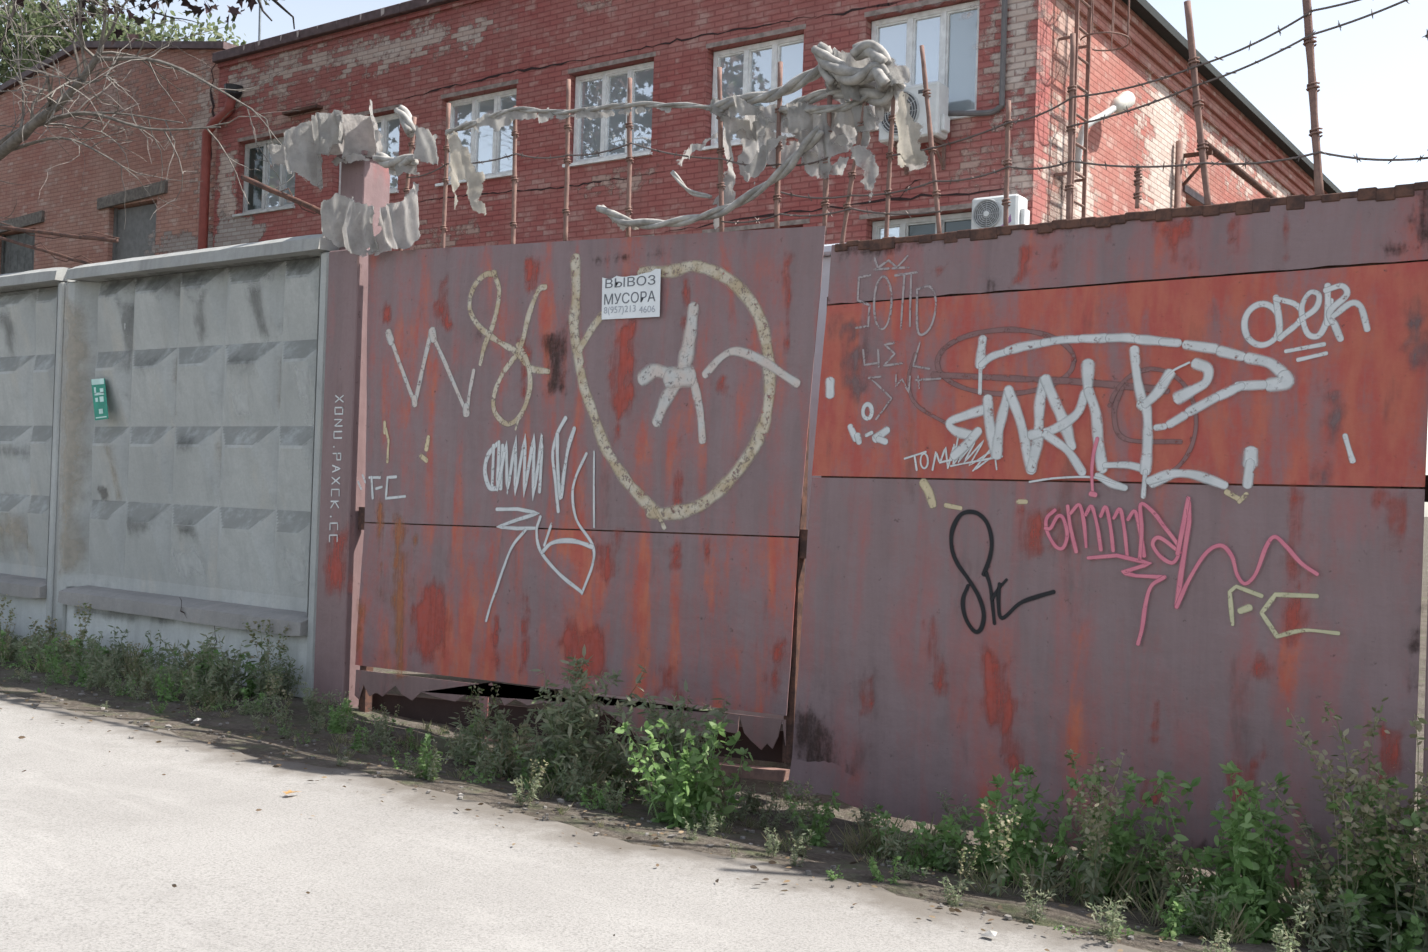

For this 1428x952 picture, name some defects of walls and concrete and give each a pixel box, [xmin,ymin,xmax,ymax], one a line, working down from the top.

peeling [1134,71,1293,210]